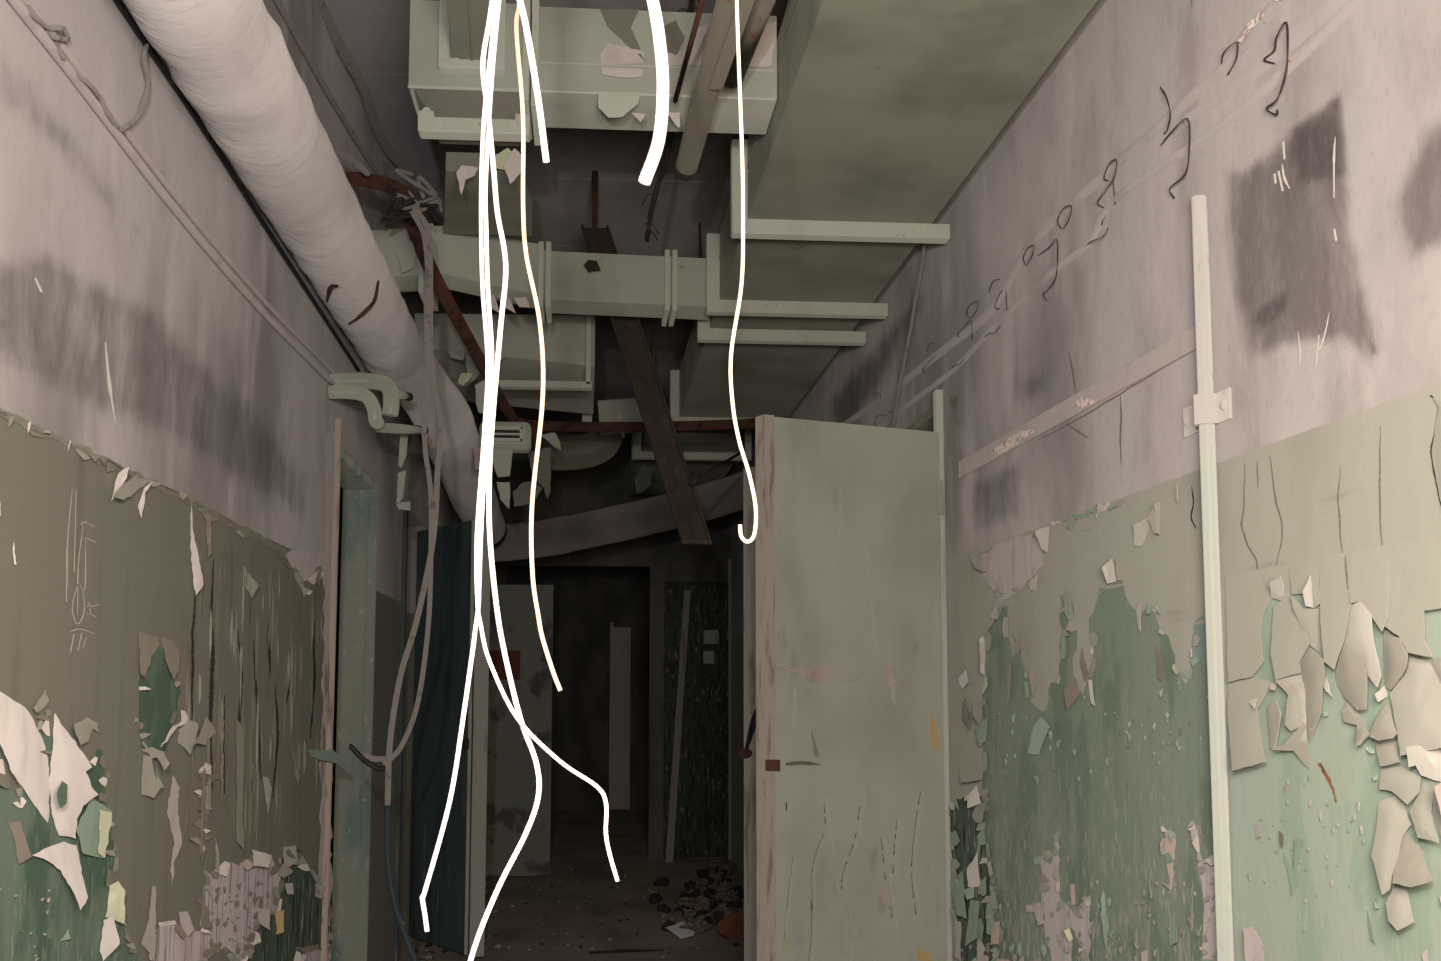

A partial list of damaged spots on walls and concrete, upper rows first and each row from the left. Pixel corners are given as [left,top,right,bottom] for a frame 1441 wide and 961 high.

peeling [1133,483,1178,546]
crack [1241,455,1283,570]
crack [1336,466,1352,663]
crack [1377,426,1385,545]
crack [1430,395,1441,505]
peeling [0,408,348,961]
peeling [949,498,1217,961]
peeling [1225,534,1441,961]